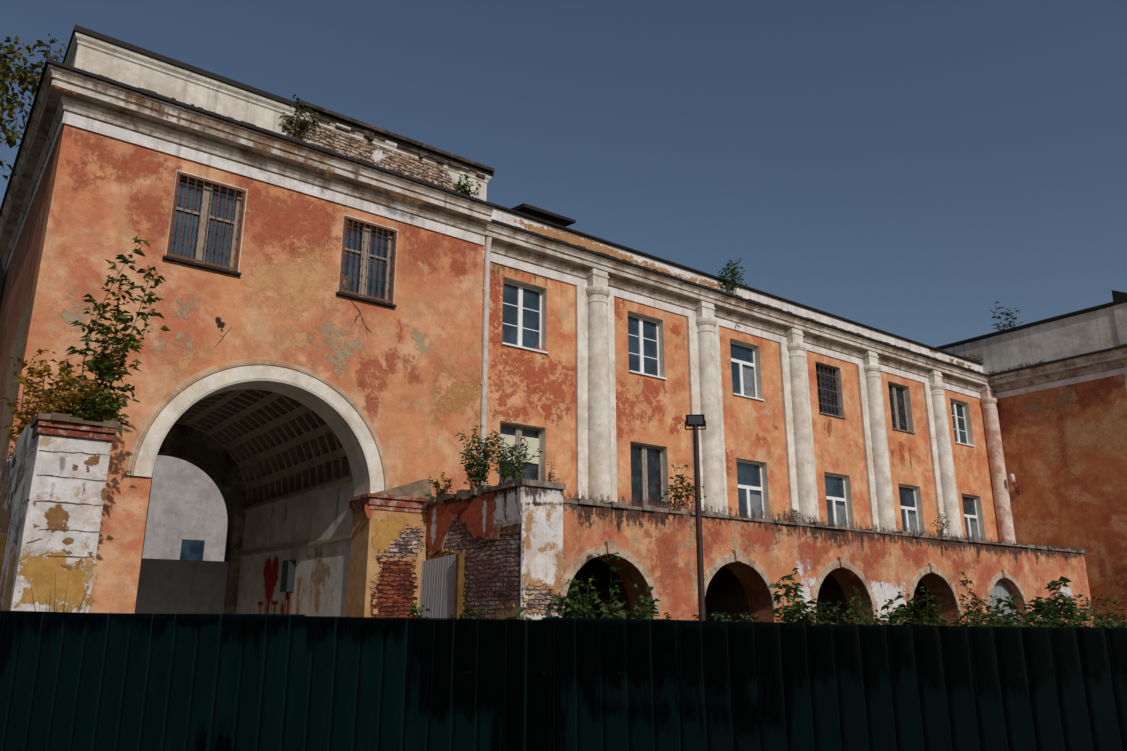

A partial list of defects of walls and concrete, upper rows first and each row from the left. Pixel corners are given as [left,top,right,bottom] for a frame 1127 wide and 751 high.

spalling [282,100,495,191]
peeling [0,286,98,612]
spalling [370,477,564,619]